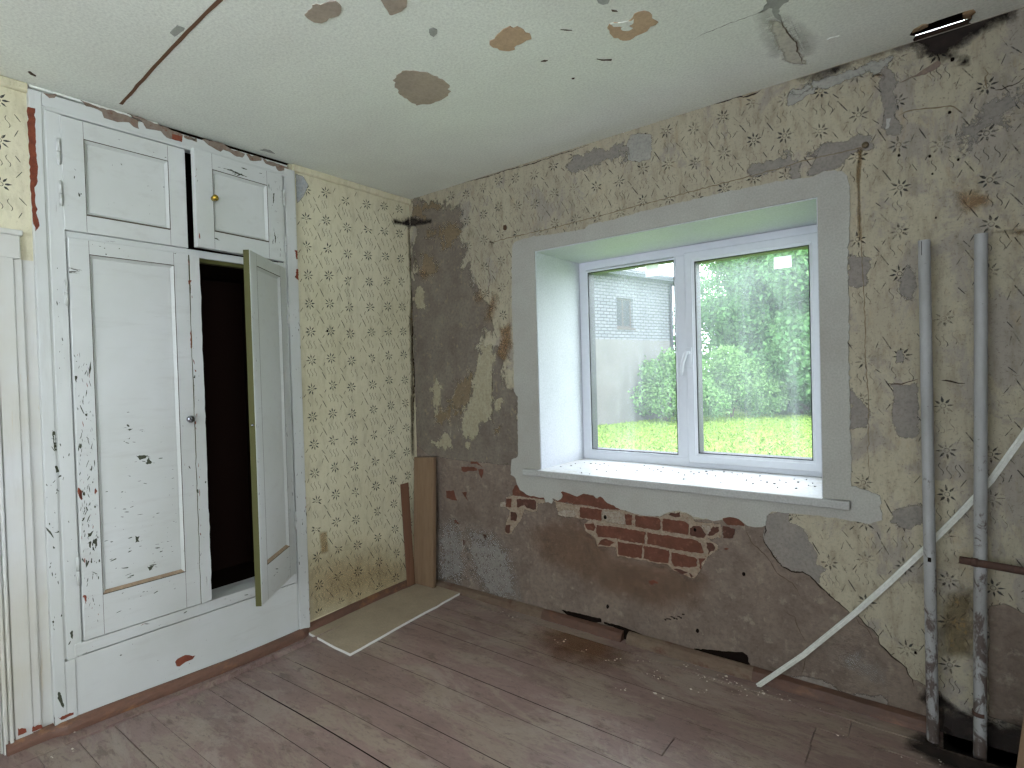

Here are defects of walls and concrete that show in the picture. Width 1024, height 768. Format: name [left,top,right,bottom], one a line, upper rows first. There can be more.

peeling [304,1,342,23]
peeling [489,26,532,51]
peeling [607,9,658,41]
crack [781,20,803,64]
peeling [393,70,451,106]
peeling [790,56,941,136]
peeling [565,142,630,173]
peeling [747,134,874,179]
flaking render [410,197,943,716]